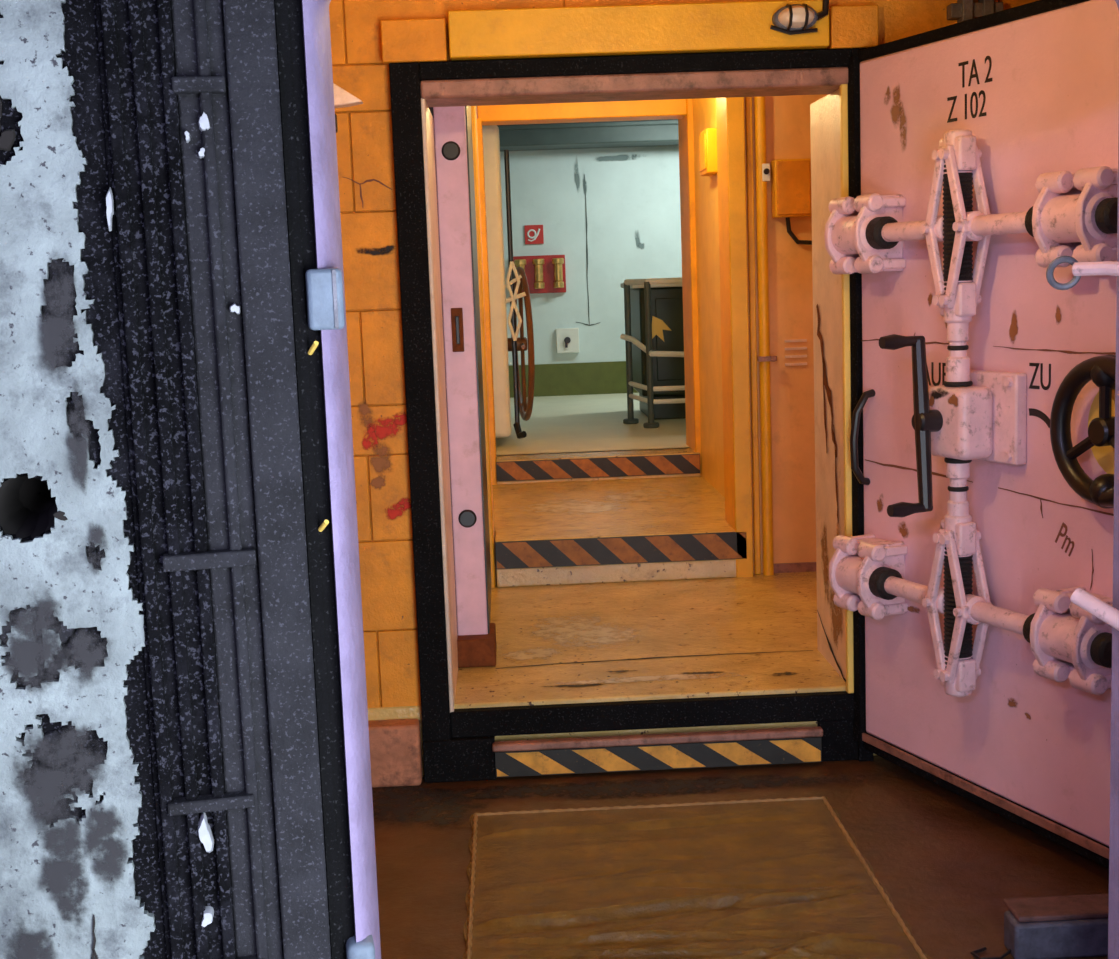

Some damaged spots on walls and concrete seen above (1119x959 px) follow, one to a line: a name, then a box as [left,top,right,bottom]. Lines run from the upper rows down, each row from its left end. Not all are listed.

rust [886,87,906,146]
damp [40,264,76,371]
damp [67,390,89,489]
hole [0,476,68,541]
damp [89,527,106,571]
damp [5,599,106,689]
damp [16,726,127,926]
damp [7,928,55,959]